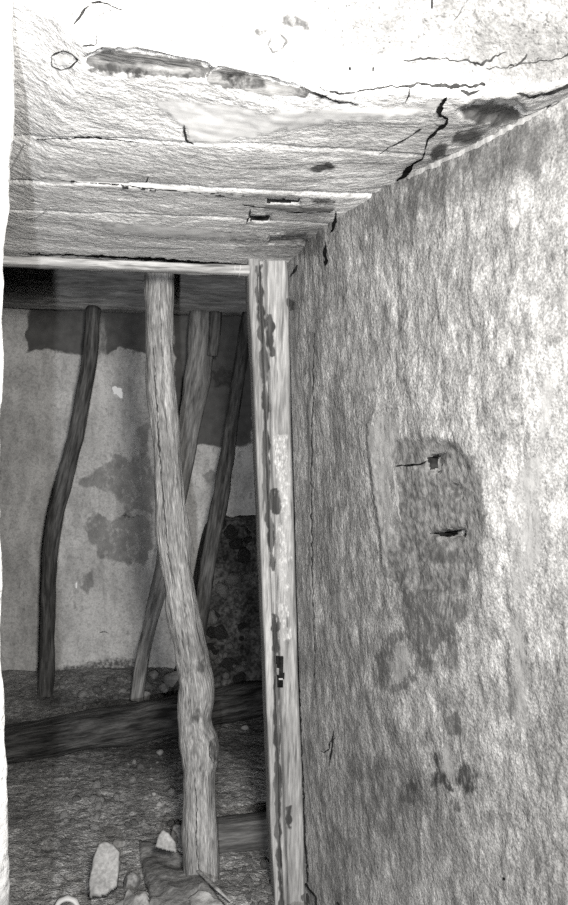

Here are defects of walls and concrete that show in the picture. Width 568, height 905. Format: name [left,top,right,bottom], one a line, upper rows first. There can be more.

crack [73,1,122,26]
crack [300,45,568,181]
water stain [79,425,154,564]
water stain [375,585,465,693]